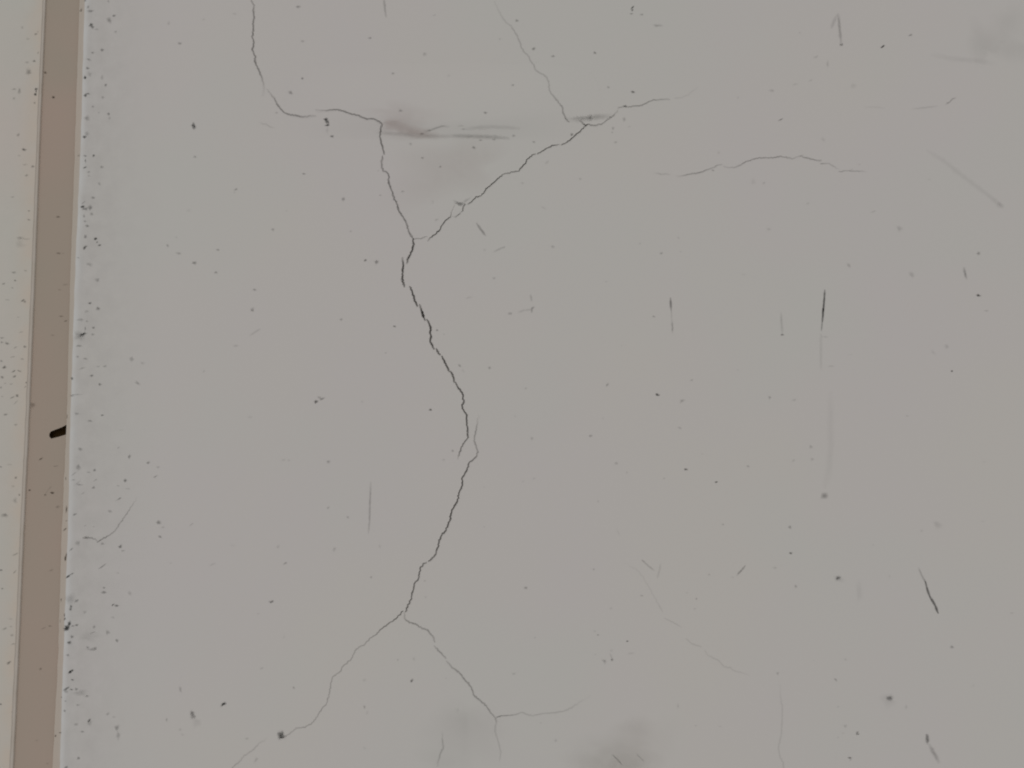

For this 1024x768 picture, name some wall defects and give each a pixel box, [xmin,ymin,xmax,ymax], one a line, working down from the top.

crack [250,0,670,719]